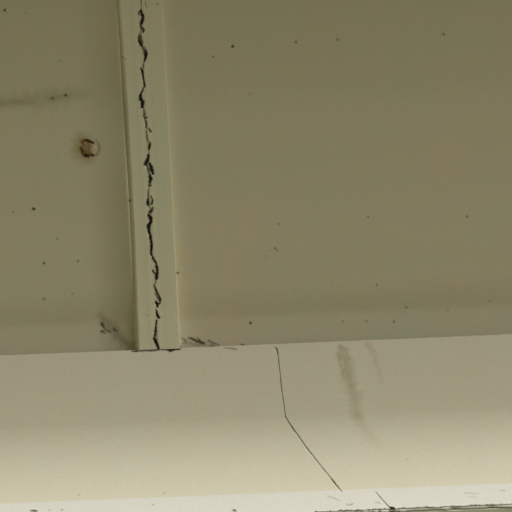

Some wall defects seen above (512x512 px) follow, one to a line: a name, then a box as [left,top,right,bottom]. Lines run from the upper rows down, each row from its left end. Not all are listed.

rust [78,139,95,157]
crack [132,10,181,352]
crack [276,348,342,492]